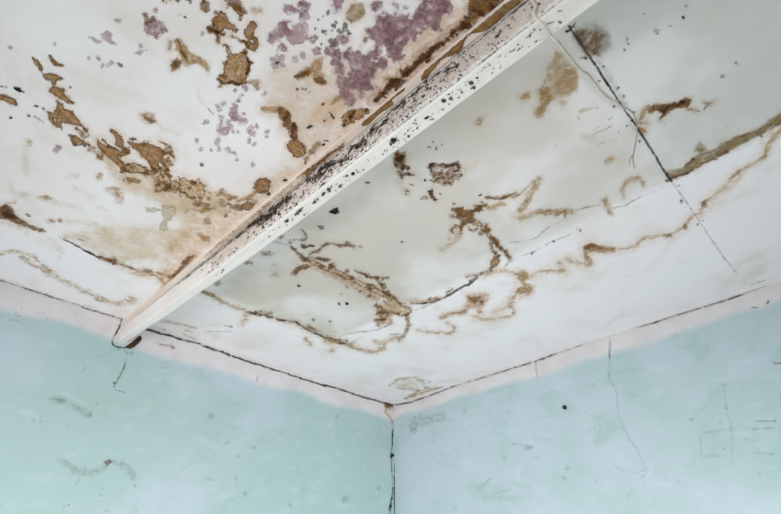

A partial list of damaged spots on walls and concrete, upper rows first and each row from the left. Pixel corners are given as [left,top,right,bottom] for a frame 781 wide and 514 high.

mould [142,8,168,39]
peeling [216,21,259,90]
peeling [301,143,344,177]
leakage [195,0,562,273]
peeling [421,0,521,80]
leakage [537,56,576,114]
crack [565,22,683,203]
leakage [584,244,615,265]
crack [632,286,766,329]
crack [145,328,592,514]